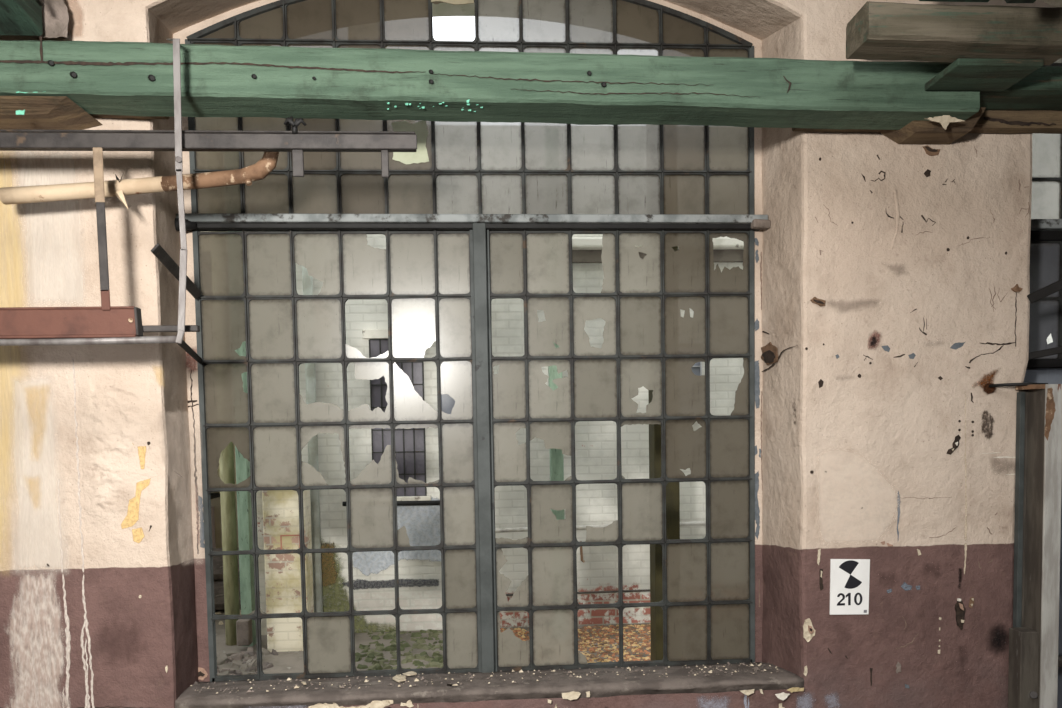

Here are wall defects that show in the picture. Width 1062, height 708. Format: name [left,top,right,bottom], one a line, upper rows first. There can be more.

water stain [0,154,82,307]
crack [965,287,1017,403]
rust [979,371,995,394]
rust [1044,388,1056,441]
water stain [0,346,95,708]
peeling [803,618,815,642]
spalling [955,597,974,630]
peeling [309,700,414,708]